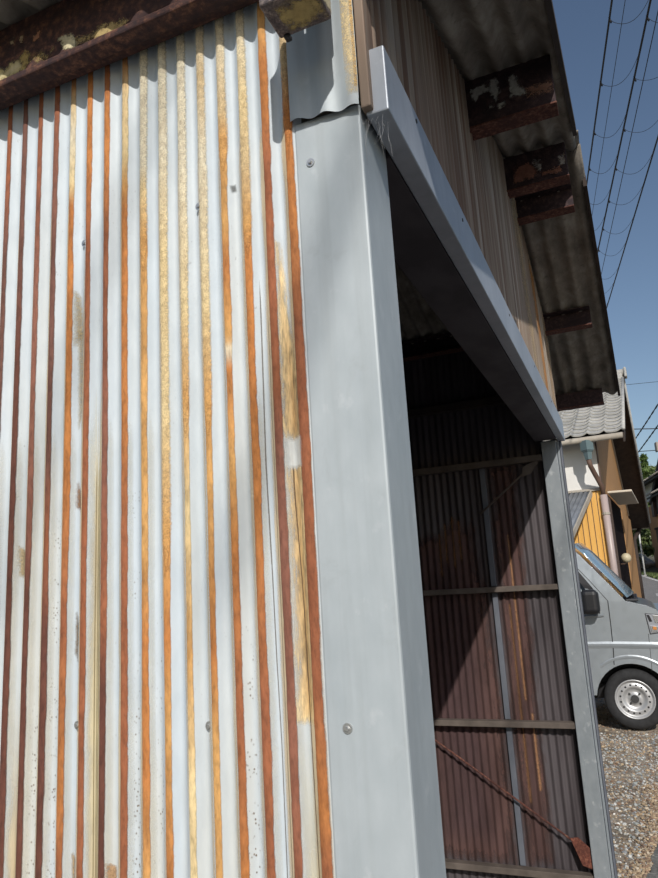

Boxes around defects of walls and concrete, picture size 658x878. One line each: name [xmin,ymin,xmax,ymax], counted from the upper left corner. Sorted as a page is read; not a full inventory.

peeling [0,30,46,80]
corrosion [0,72,93,878]
peeling [59,20,126,49]
corrosion [98,33,198,878]
corrosion [195,25,223,878]
corrosion [215,2,333,878]
corrosion [341,0,357,90]
peeling [470,74,552,109]